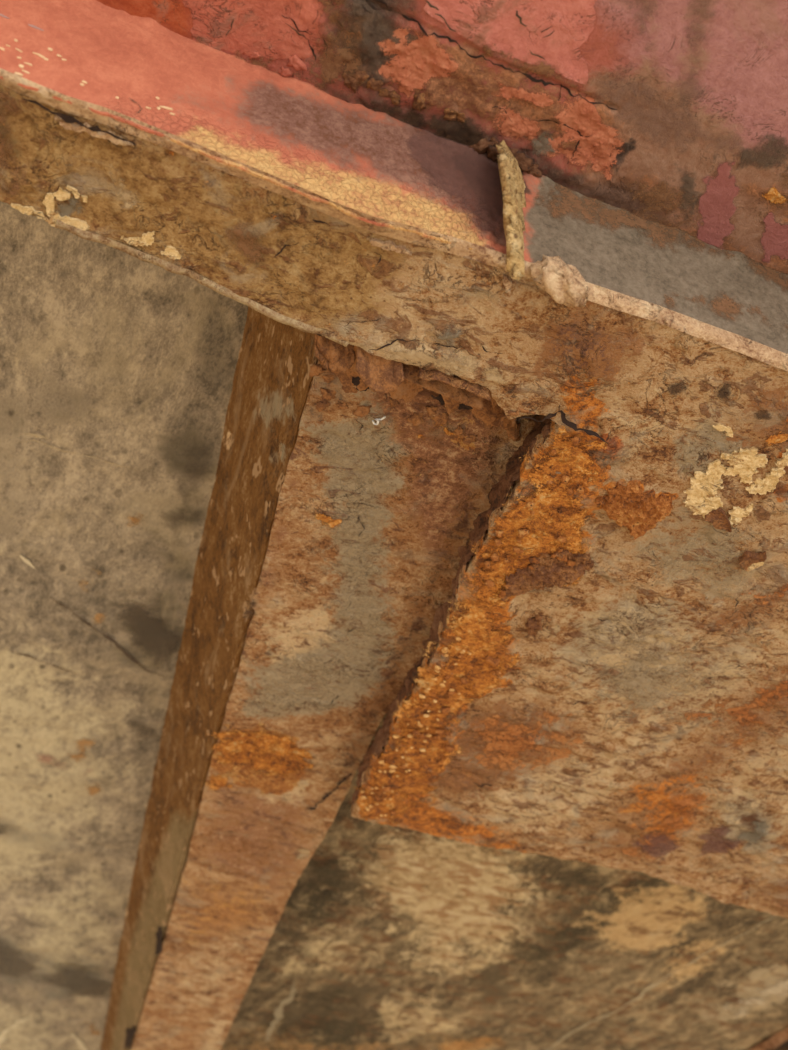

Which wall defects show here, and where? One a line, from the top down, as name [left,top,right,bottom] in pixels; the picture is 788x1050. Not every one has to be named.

crack [282,15,342,61]
damp [341,0,418,80]
crack [361,0,617,162]
corrosion [54,115,134,146]
corrosion [236,0,626,249]
damp [741,135,788,168]
peeling [11,185,90,231]
peeling [120,231,181,260]
crack [515,403,608,444]
peeling [683,446,788,526]
corrosion [356,426,607,824]
damp [50,964,112,995]